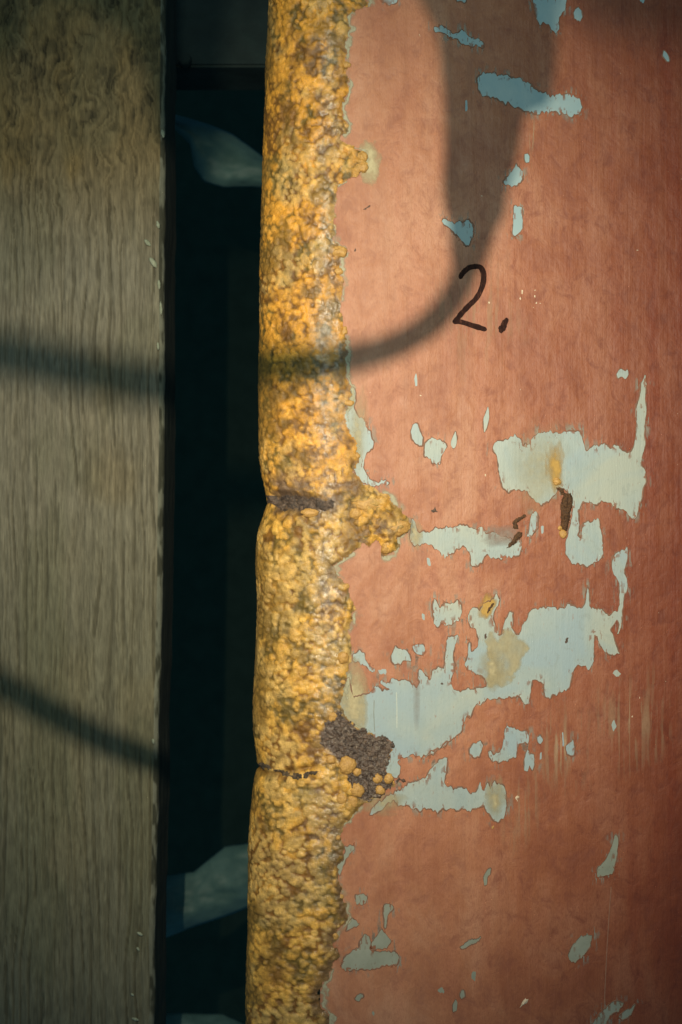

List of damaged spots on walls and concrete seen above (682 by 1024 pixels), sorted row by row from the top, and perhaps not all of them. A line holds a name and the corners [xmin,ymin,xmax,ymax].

peeling [345,0,398,62]
peeling [530,0,584,35]
peeling [342,80,353,137]
peeling [475,71,583,120]
peeling [442,216,475,247]
peeling [343,338,398,506]
rust [550,453,561,487]
rust [245,0,421,1024]
peeling [339,368,649,829]
peeling [596,834,619,881]
peeling [321,891,401,1024]
peeling [568,931,596,963]